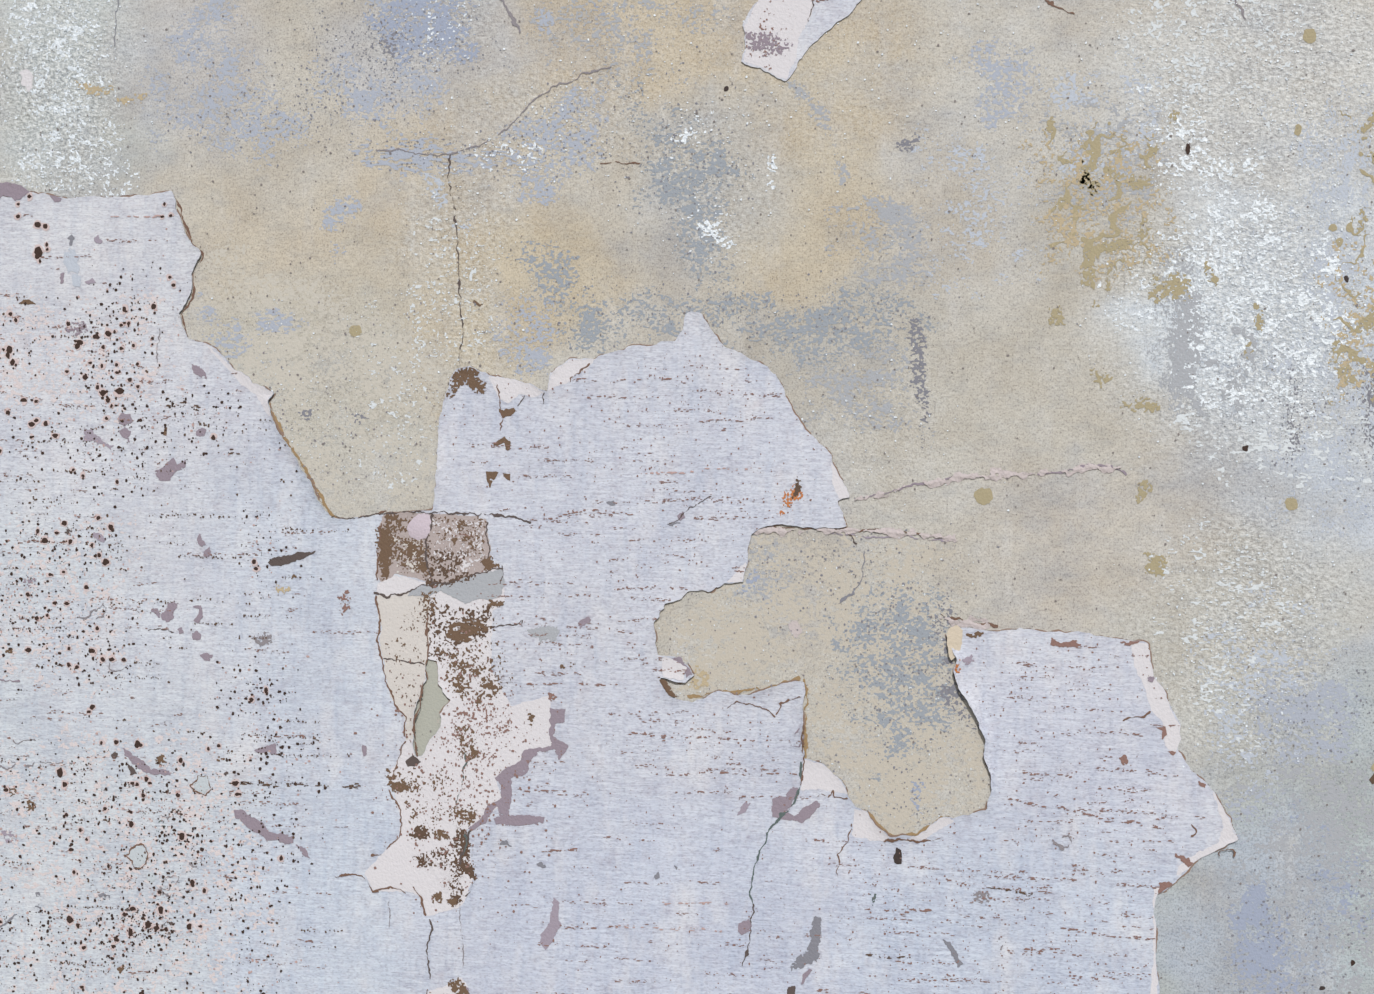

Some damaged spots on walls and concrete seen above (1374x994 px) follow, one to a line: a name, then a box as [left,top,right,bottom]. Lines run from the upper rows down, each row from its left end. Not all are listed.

peeling [741,0,861,81]
crack [376,66,611,363]
corrosion [1231,303,1275,384]
peeling [0,182,1238,994]